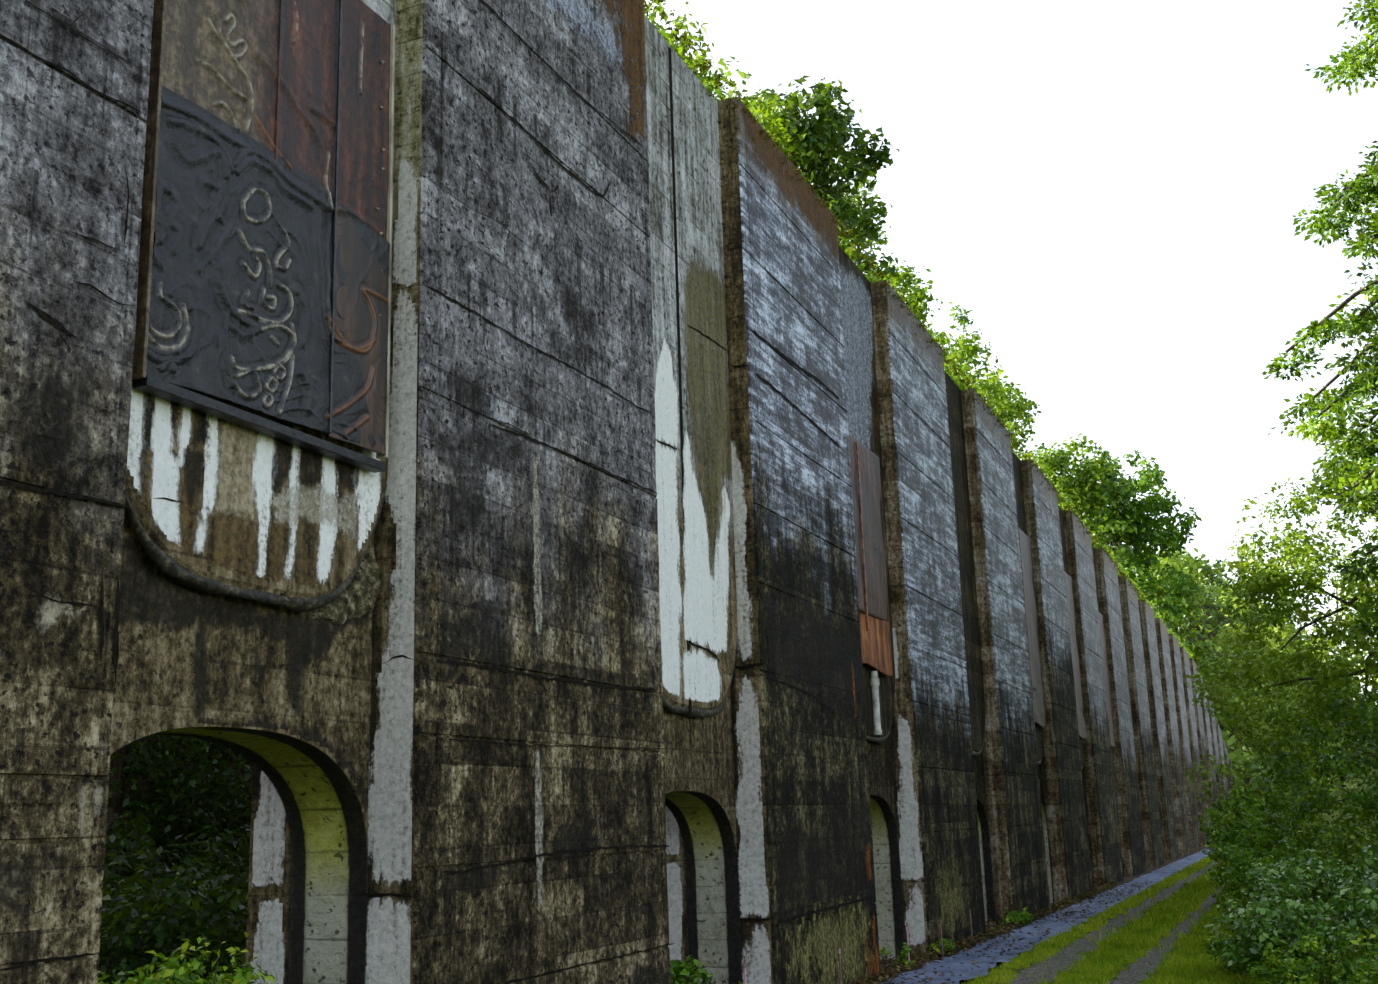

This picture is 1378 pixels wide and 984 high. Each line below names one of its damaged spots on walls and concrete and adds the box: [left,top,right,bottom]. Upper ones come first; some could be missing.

water stain [684,263,732,579]